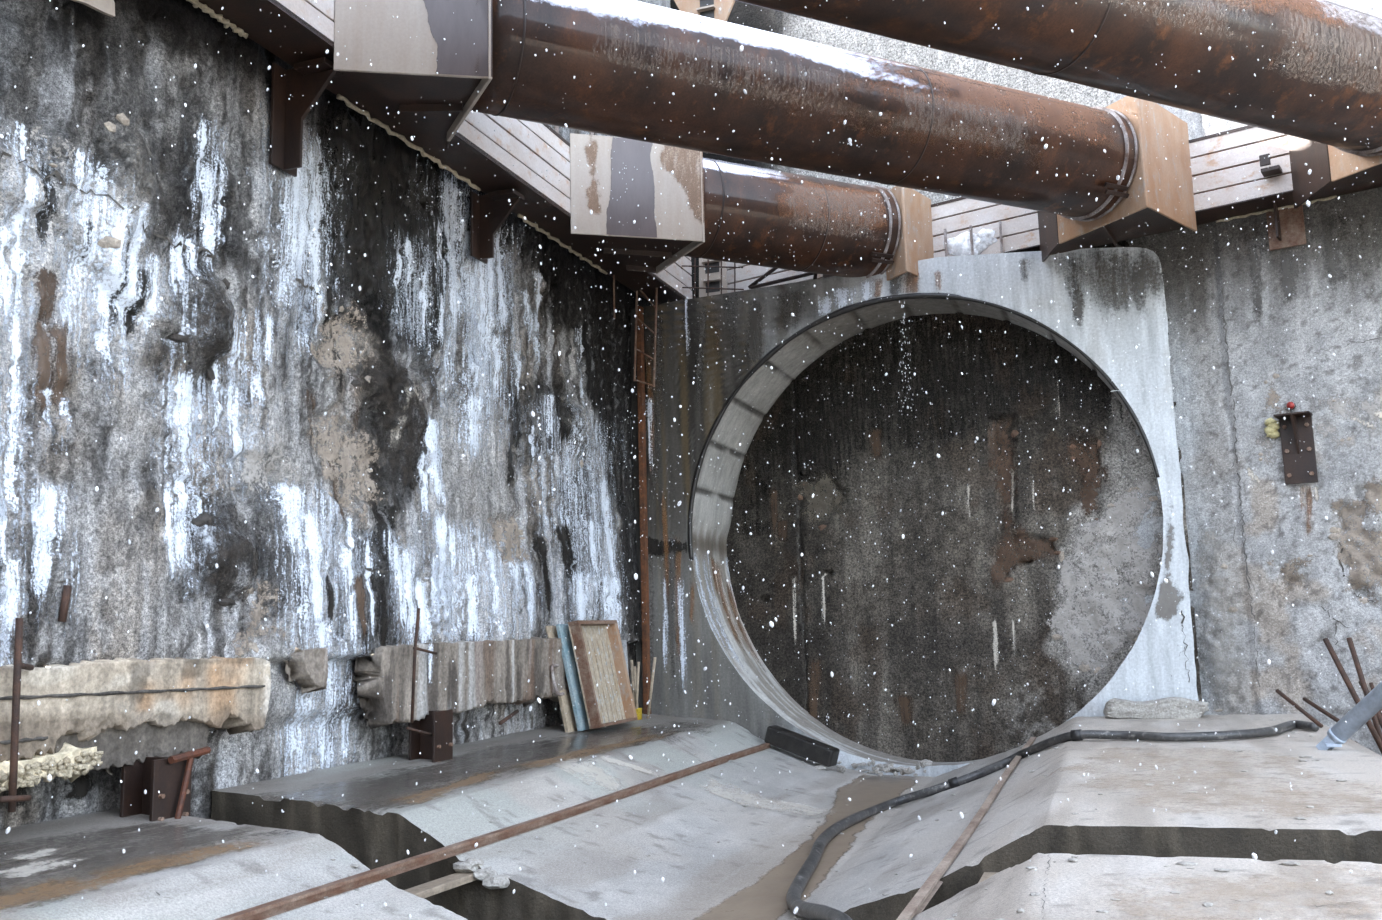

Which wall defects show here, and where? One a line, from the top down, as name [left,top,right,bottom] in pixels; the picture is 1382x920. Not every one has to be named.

spalling [310,301,378,397]
water stain [0,101,712,814]
water stain [726,296,763,362]
water stain [740,275,1139,539]
water stain [1054,248,1164,326]
crack [1220,255,1260,687]
water stain [1248,245,1263,325]
corrosion [662,495,694,656]
water stain [648,537,744,688]
water stain [992,619,1016,670]
spalling [1328,477,1382,605]
corrosion [895,694,914,727]